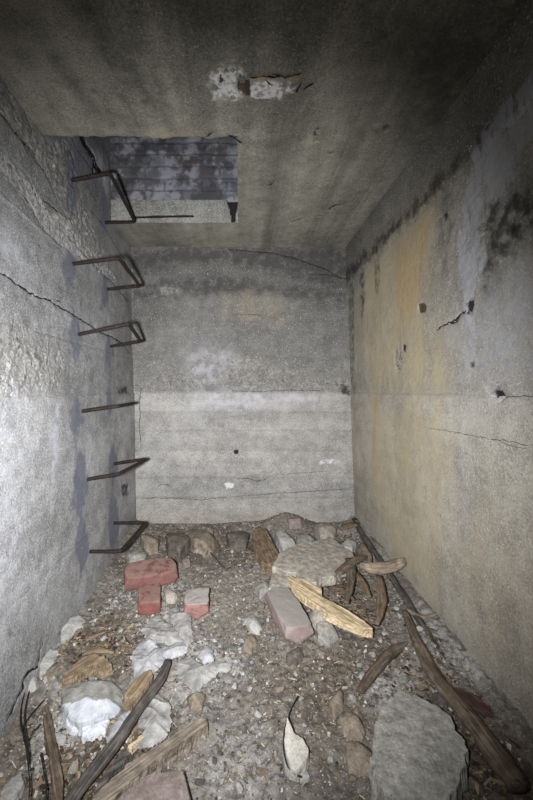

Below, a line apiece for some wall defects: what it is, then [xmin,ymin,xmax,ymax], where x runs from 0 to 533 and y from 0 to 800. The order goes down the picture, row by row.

peeling [199,64,250,105]
crack [72,136,101,174]
crack [229,249,346,280]
crack [0,273,132,354]
crack [437,310,467,330]
damp [131,110,533,569]
crack [430,428,527,449]